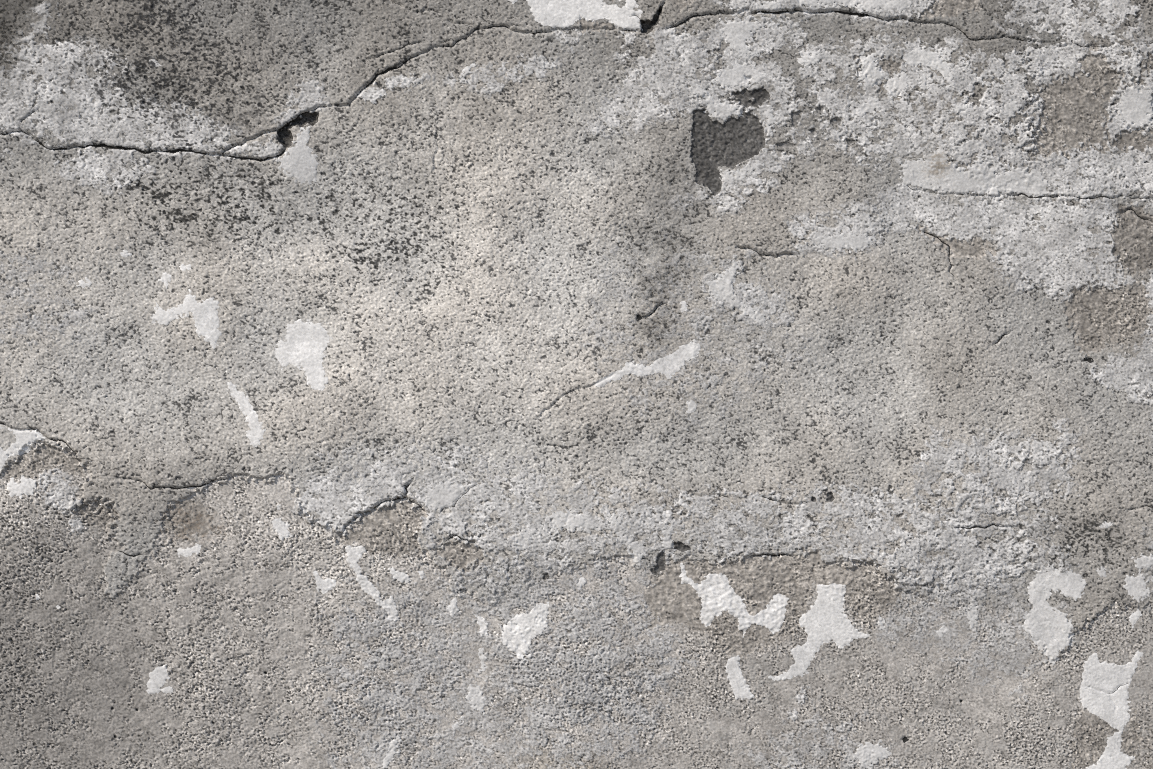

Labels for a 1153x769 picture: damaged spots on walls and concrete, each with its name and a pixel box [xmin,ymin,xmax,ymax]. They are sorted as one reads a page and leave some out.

crack [610,3,1153,48]
crack [1,2,582,162]
peeling [355,0,1153,438]
crack [995,193,1152,222]
peeling [158,264,191,289]
crack [920,231,954,276]
peeling [151,289,222,349]
peeling [274,319,333,391]
peeling [227,382,266,447]
crack [136,474,238,490]
crack [349,480,485,544]
spalling [0,418,1153,769]